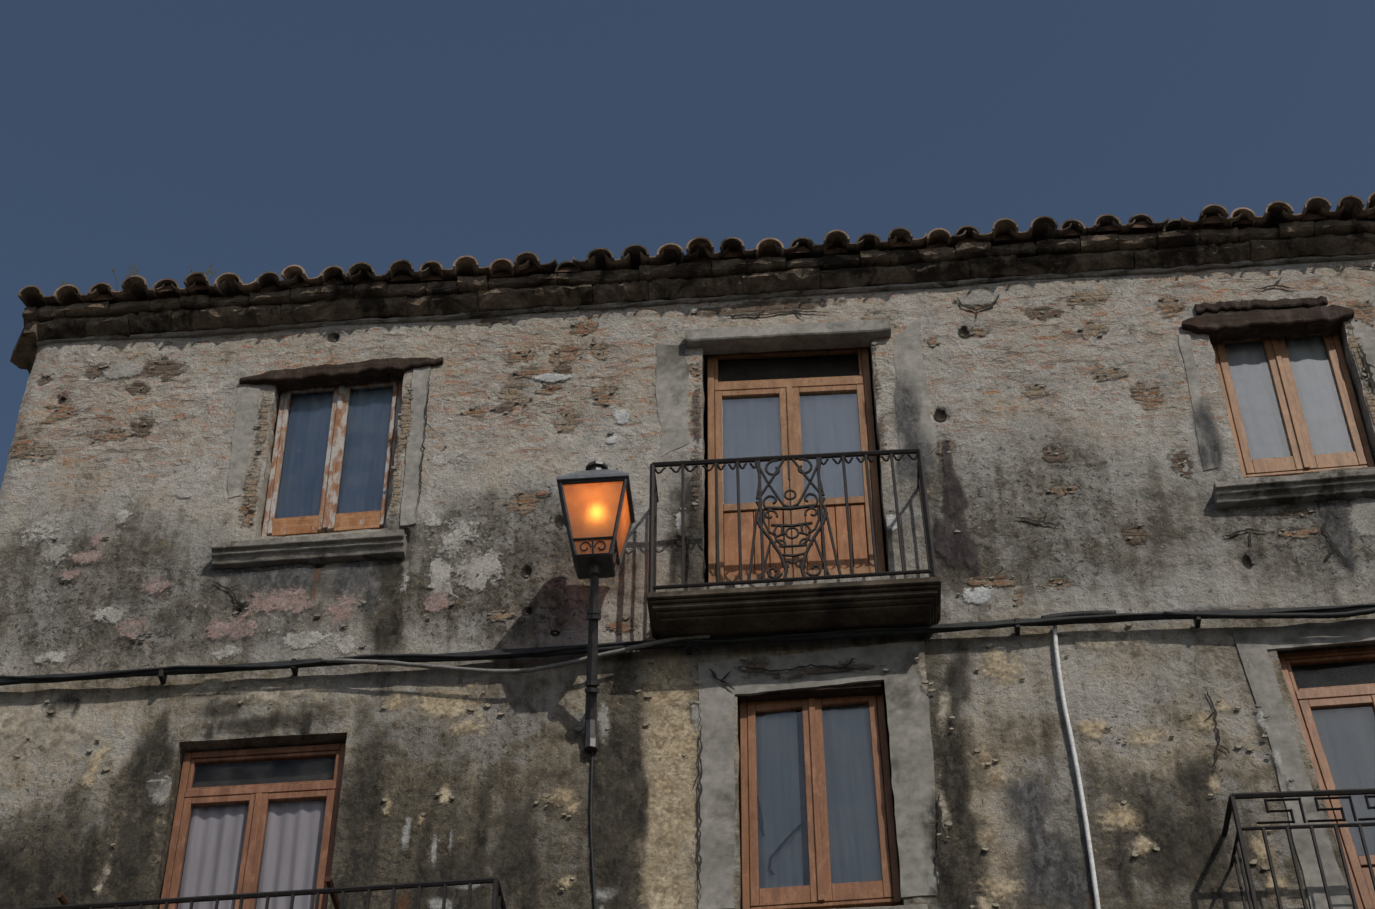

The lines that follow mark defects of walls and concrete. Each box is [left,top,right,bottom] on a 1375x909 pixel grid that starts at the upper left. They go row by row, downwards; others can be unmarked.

leakage [895,384,981,574]
peeling [60,533,109,582]
peeling [116,615,152,641]
peeling [141,578,170,594]
peeling [205,589,367,640]
peeling [423,589,455,620]
leakage [949,642,970,699]
leakage [48,694,79,717]
leakage [112,718,171,909]
leakage [592,727,648,909]
leakage [924,720,975,909]
leakage [1008,779,1091,909]